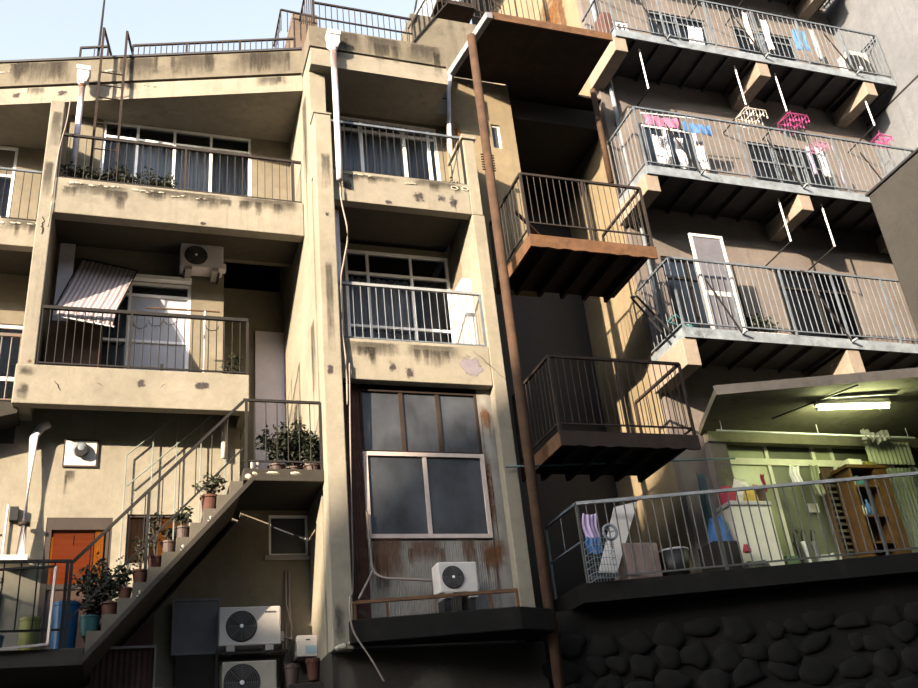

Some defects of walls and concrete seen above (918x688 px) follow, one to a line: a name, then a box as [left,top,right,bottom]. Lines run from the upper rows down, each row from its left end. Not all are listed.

leakage [65,183,126,204]
leakage [149,189,293,209]
leakage [354,342,390,355]
leakage [414,345,452,361]
corrosion [371,539,444,577]